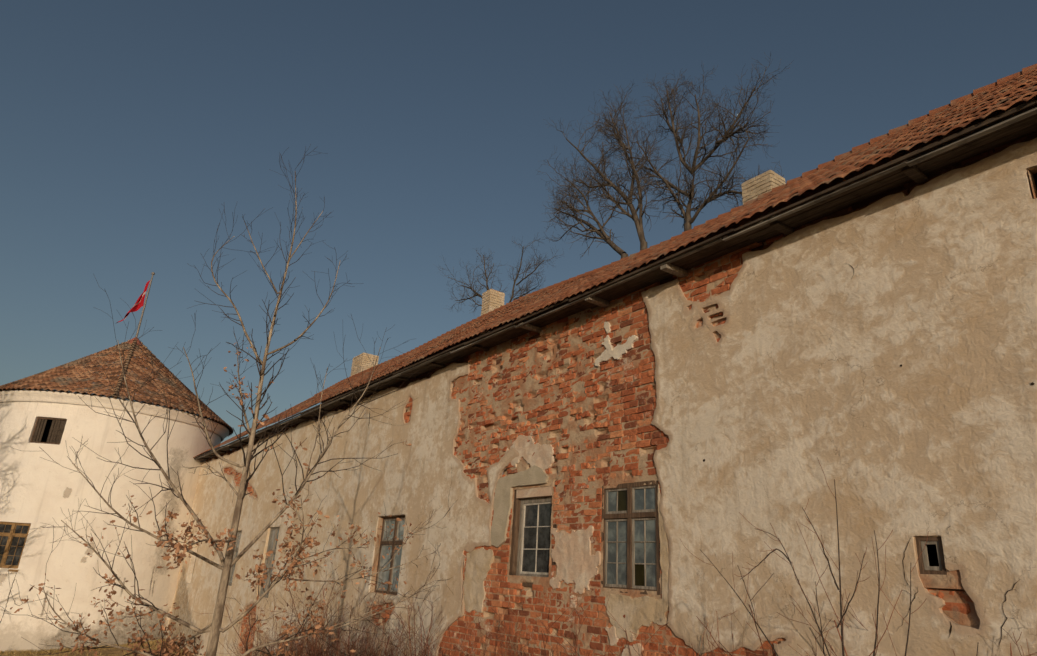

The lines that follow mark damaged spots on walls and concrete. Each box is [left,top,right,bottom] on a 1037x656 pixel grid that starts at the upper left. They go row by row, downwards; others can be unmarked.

spalling [672,234,784,342]
spalling [404,397,413,423]
spalling [439,281,786,656]
spalling [927,588,980,629]